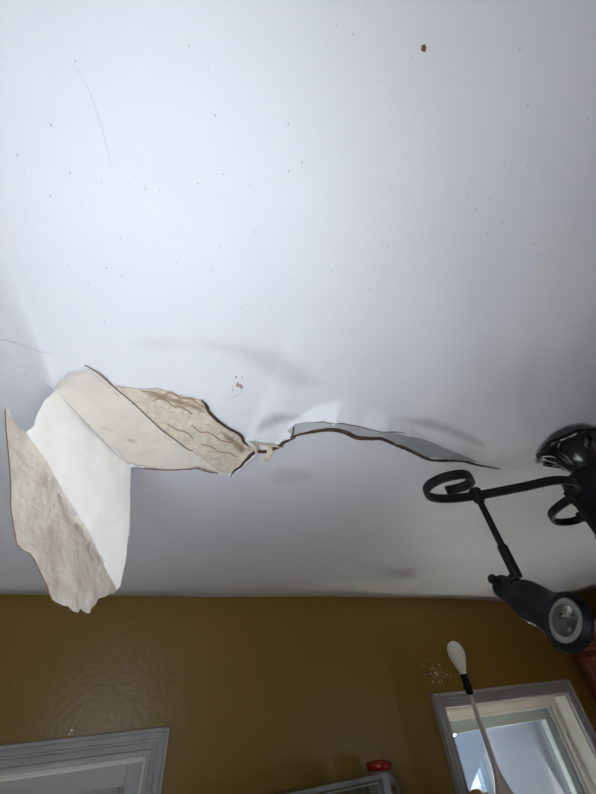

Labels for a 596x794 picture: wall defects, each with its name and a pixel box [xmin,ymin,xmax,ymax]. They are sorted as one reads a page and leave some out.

flaking render [115,385,284,473]
crack [84,365,499,477]
peeling [5,391,131,614]